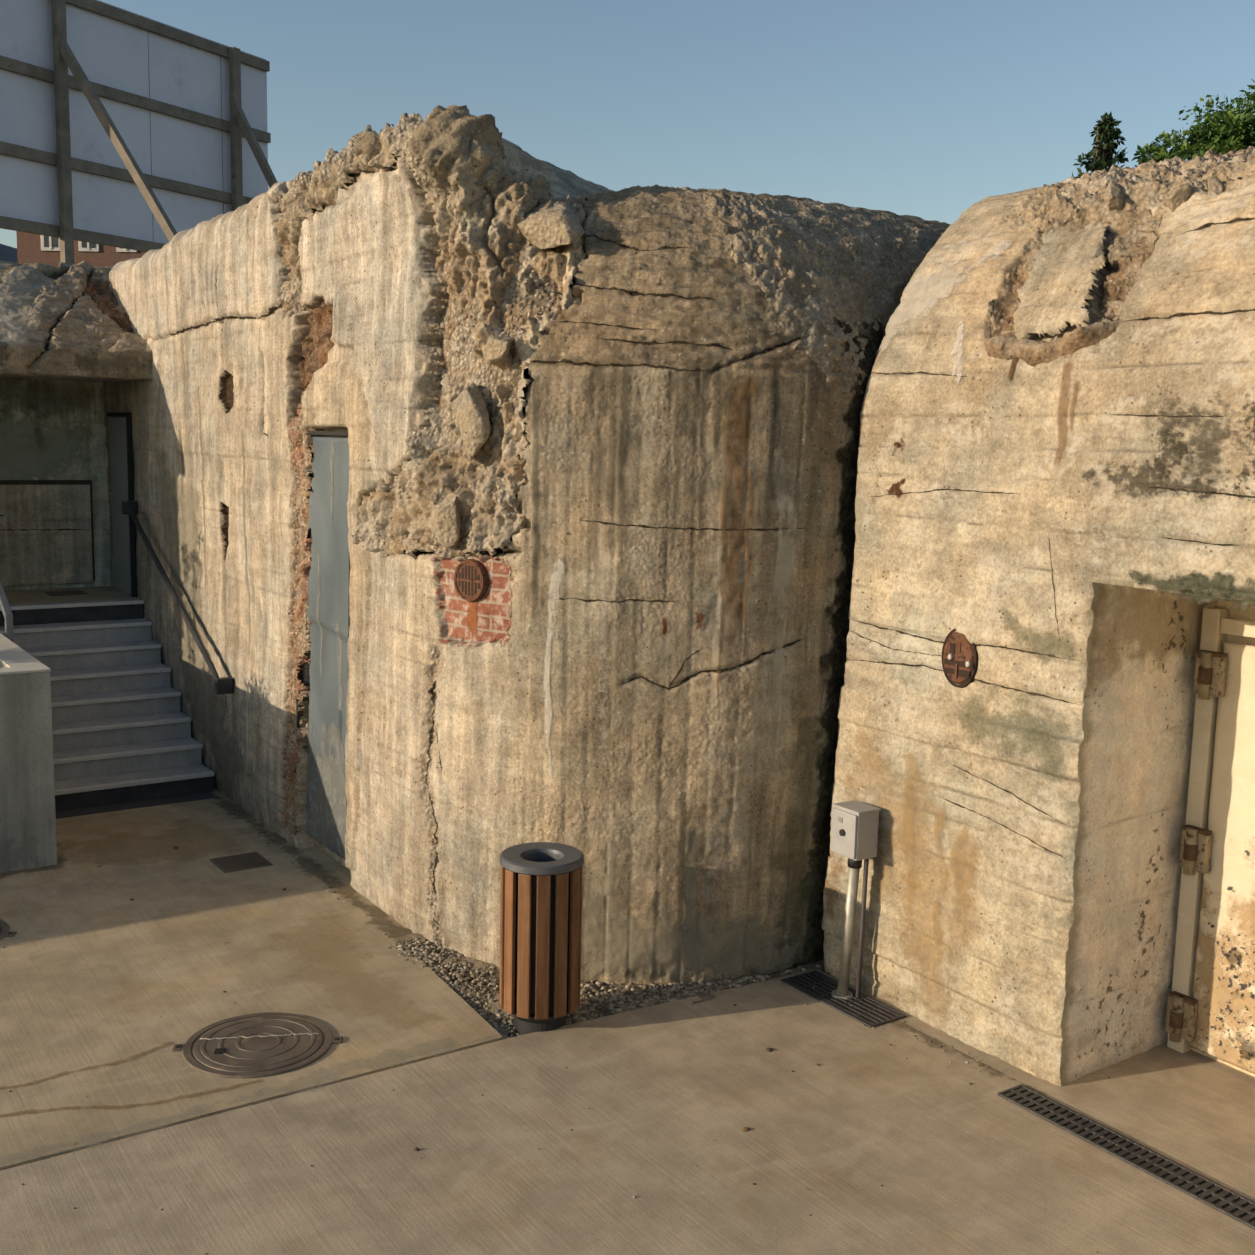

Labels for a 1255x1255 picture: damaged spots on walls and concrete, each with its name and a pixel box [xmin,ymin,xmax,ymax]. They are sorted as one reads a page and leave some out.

crack [525,283,803,372]
spalling [984,181,1192,367]
spalling [274,104,587,839]
rust [887,479,905,498]
mould [1082,391,1255,503]
crack [623,638,803,690]
water stain [581,240,1011,978]
crack [851,620,944,671]
water stain [1176,572,1234,598]
crack [425,655,442,941]
crack [937,764,1068,859]
peeling [1192,923,1255,1068]